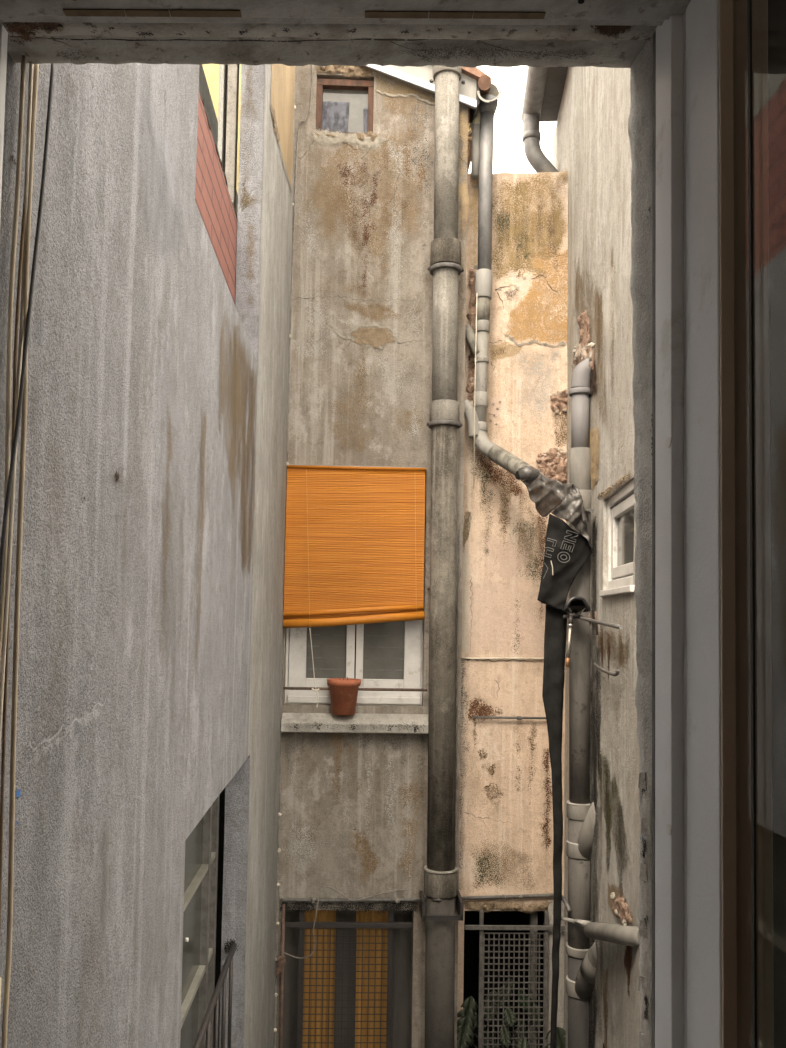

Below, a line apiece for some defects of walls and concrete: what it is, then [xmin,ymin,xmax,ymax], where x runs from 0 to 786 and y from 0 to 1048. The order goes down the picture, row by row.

leakage [301,94,435,302]
peeling [458,108,479,332]
leakage [492,197,536,265]
peeling [489,167,596,397]
spalling [465,347,475,400]
spalling [549,389,568,447]
leakage [150,288,257,771]
leakage [466,442,549,585]
leakage [590,516,631,922]
leakage [471,840,542,894]
leakage [589,938,624,1048]